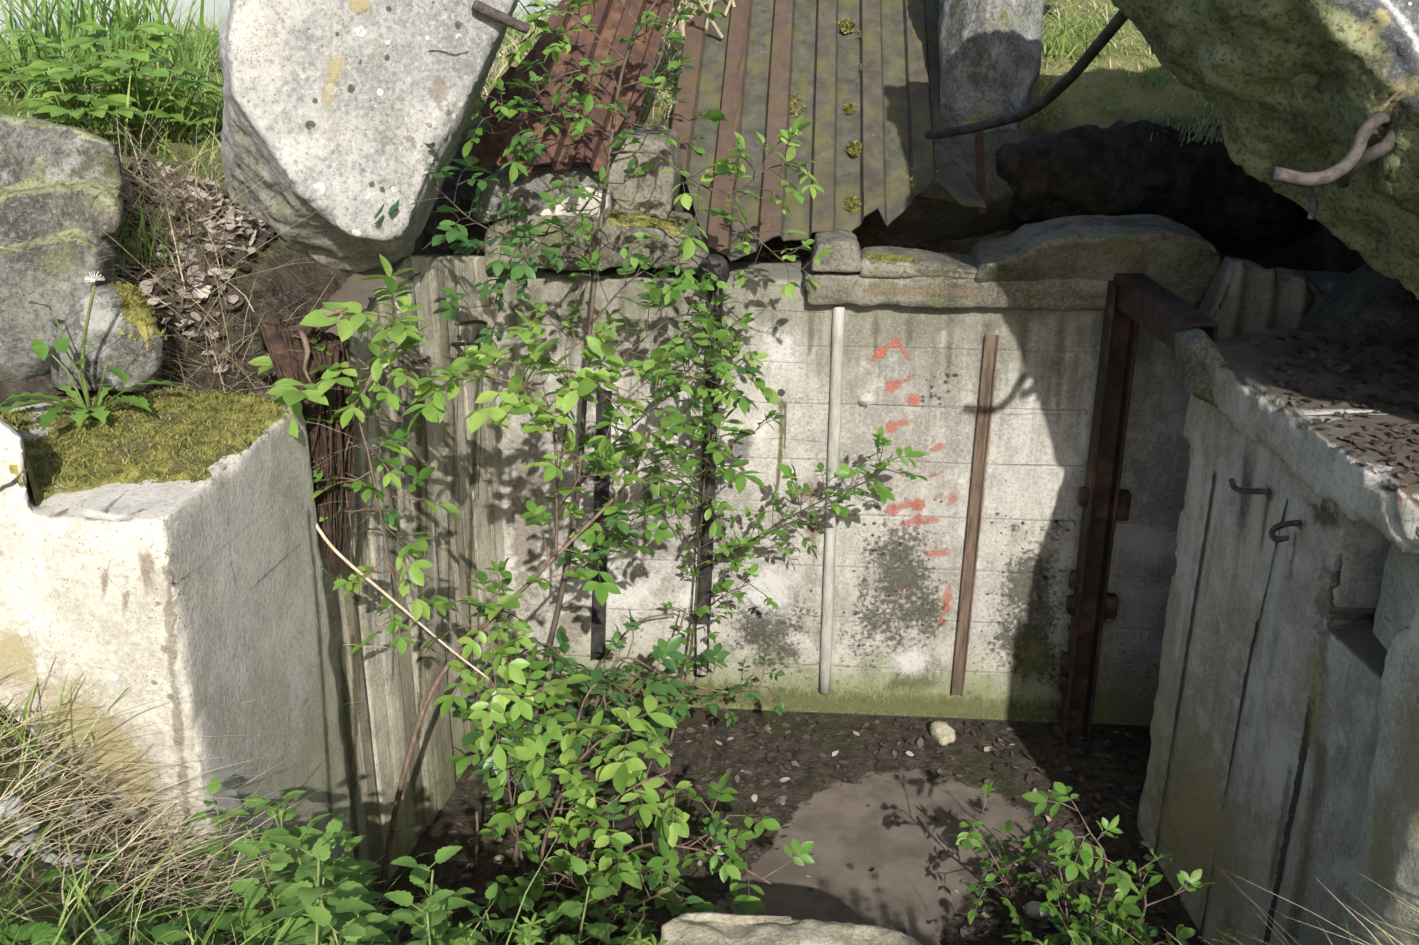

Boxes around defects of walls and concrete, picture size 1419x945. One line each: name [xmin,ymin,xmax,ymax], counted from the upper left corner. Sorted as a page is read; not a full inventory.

leakage [762,331,794,374]
corrosion [1260,487,1272,548]
leakage [721,565,817,668]
leakage [843,506,946,675]
mould [981,513,1069,683]